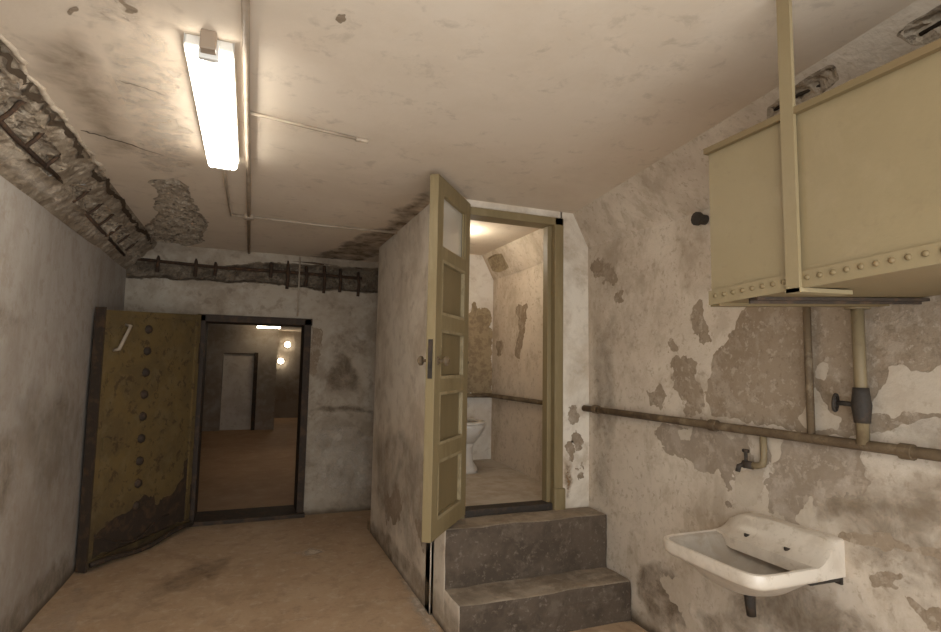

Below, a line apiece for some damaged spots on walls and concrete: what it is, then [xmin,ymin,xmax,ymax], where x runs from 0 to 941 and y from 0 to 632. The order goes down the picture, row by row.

spalling [897,5,941,46]
spalling [766,99,780,120]
spalling [795,65,839,106]
spalling [0,34,379,296]
peeling [515,303,528,359]
peeling [864,295,941,434]
peeling [565,405,584,480]
peeling [646,299,871,528]
peeling [838,531,941,560]
leakage [647,588,681,616]
peeling [652,564,703,632]
peeling [869,571,941,632]